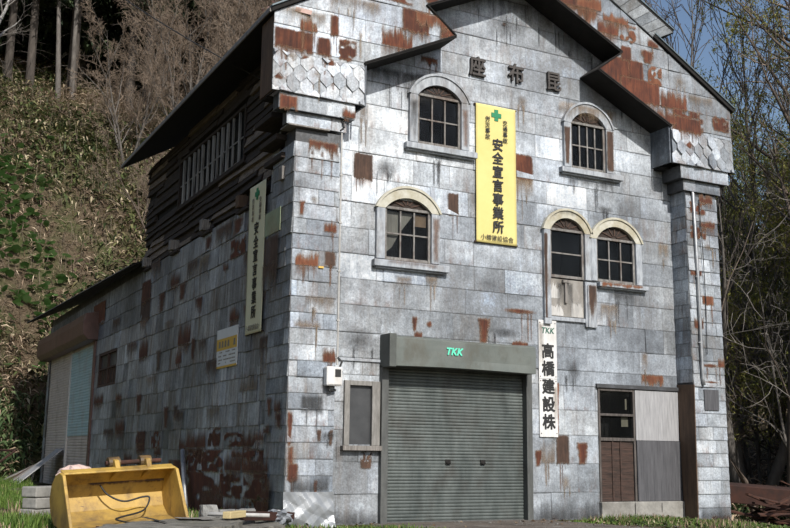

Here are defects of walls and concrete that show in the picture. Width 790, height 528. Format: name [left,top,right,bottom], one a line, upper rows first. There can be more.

corrosion [382,0,454,51]
corrosion [561,0,628,40]
corrosion [275,14,339,87]
corrosion [601,40,701,148]
corrosion [354,152,373,192]
corrosion [516,154,533,192]
corrosion [448,193,459,227]
corrosion [295,251,336,280]
corrosion [478,318,490,343]
corrosion [224,398,298,492]
corrosion [556,383,588,475]
corrosion [201,487,245,509]